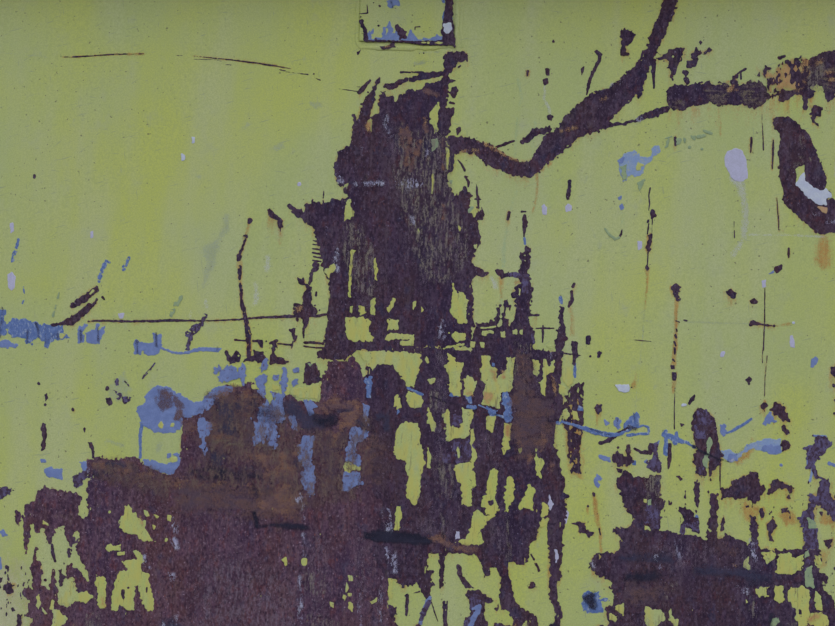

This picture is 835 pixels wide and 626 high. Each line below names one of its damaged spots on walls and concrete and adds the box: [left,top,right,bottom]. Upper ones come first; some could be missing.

corrosion [619,28,636,63]
corrosion [586,50,603,95]
corrosion [770,115,835,270]
corrosion [224,217,266,365]
peeling [0,308,105,349]
peeling [133,332,222,356]
corrosion [266,328,298,367]
peeling [136,358,299,475]
peeling [0,486,14,499]
peeling [40,459,92,488]
peeling [297,435,316,497]
corrosion [572,399,835,626]